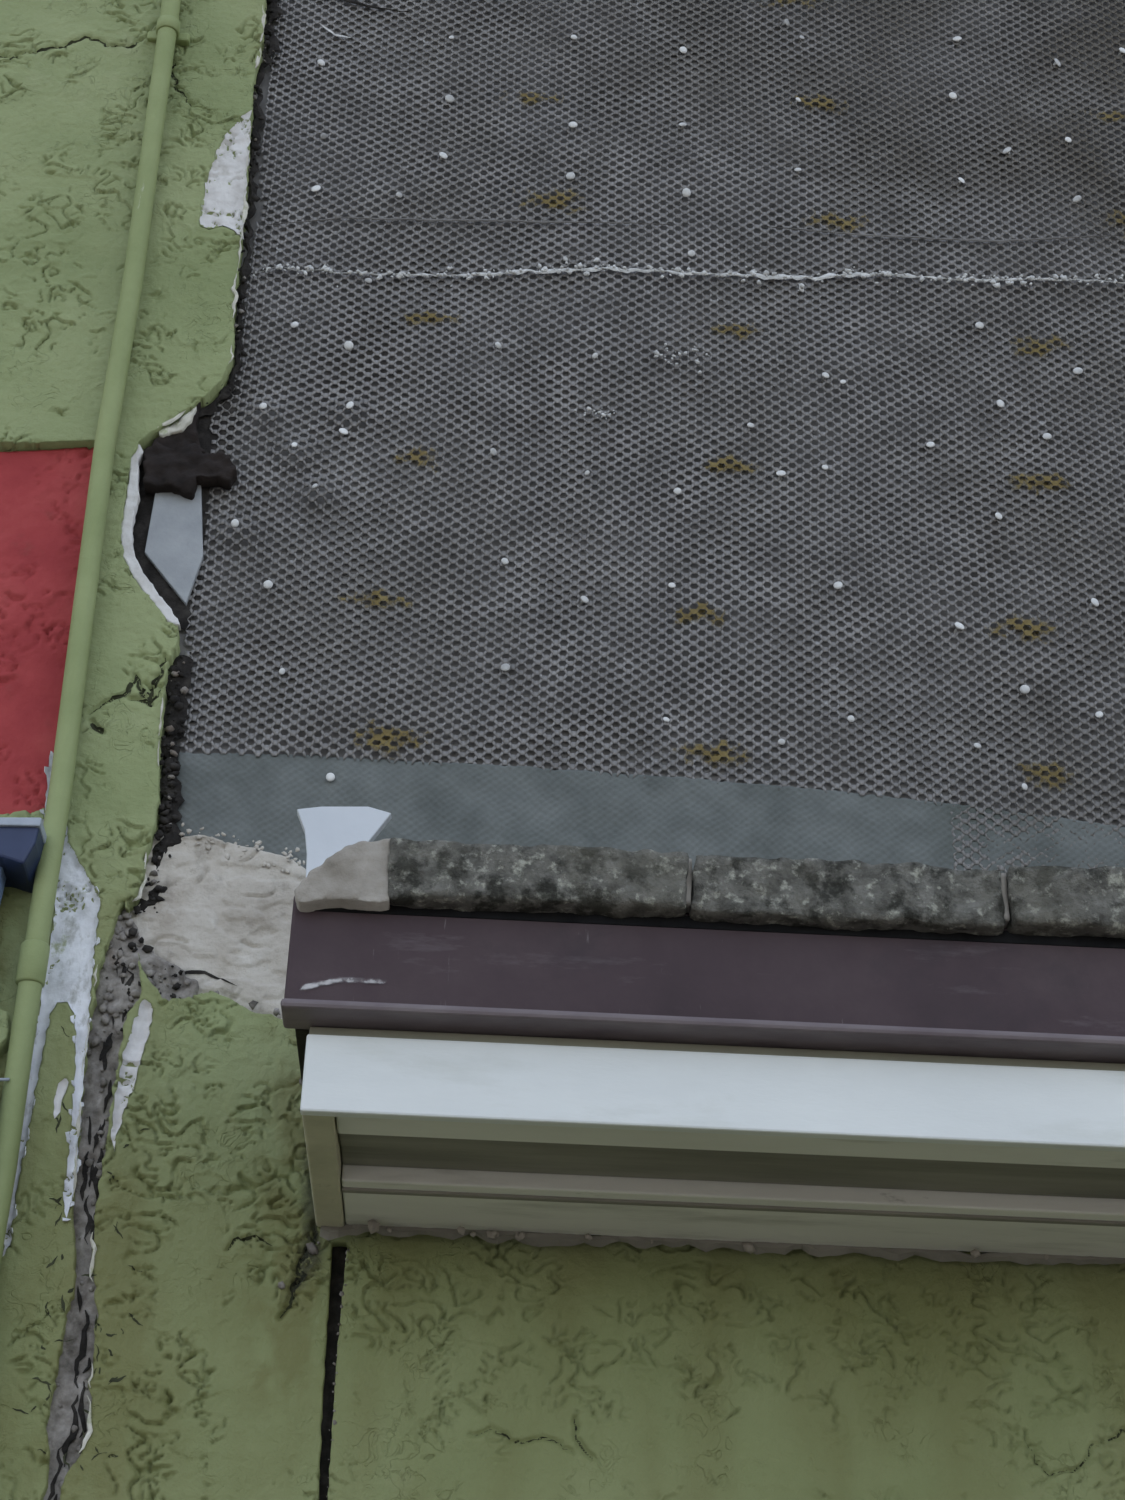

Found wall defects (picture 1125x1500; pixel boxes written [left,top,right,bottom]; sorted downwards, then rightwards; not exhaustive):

spalling [121,0,283,631]
corrosion [1010,335,1069,357]
corrosion [705,455,755,473]
corrosion [1009,473,1071,496]
corrosion [338,589,413,608]
corrosion [676,602,724,623]
corrosion [991,617,1056,643]
corrosion [354,719,429,753]
corrosion [674,740,747,763]
corrosion [1018,762,1072,790]
spalling [123,652,306,1019]
crack [12,908,199,1500]